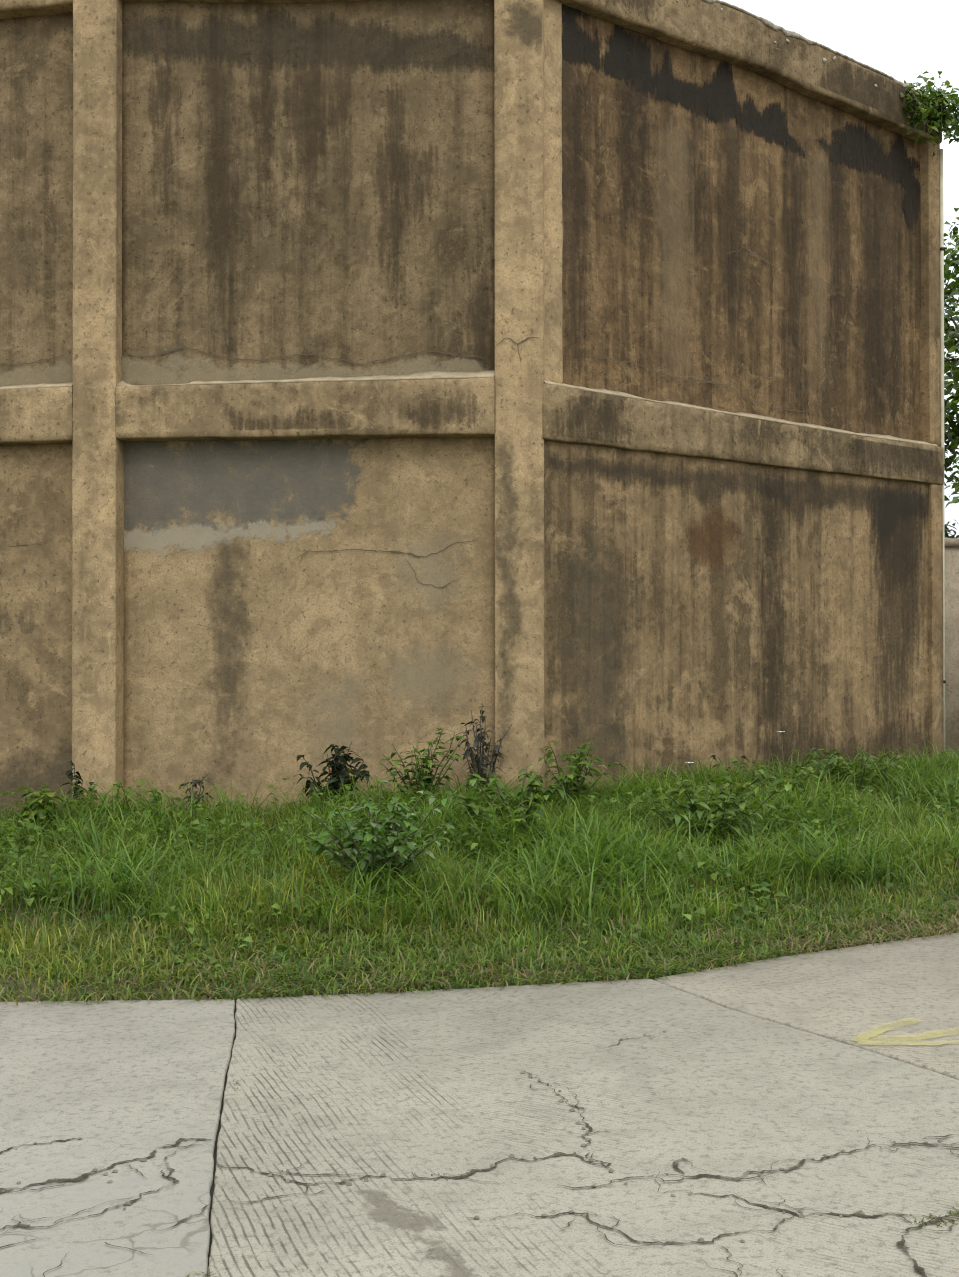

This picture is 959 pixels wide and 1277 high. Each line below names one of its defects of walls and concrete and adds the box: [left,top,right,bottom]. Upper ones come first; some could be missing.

damp [123,14,485,71]
damp [562,4,805,157]
damp [821,122,920,231]
damp [124,519,336,555]
damp [553,458,929,537]